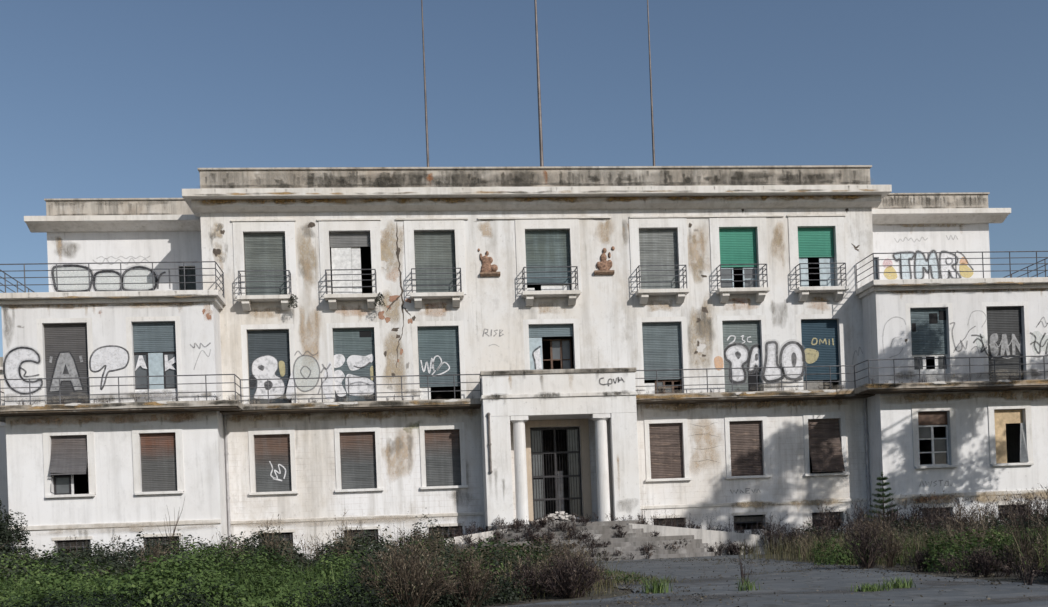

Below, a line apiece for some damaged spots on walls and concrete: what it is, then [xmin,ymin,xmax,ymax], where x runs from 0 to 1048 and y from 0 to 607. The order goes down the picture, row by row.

leakage [202,171,500,205]
leakage [512,172,545,201]
leakage [558,173,651,202]
leakage [664,175,715,200]
crack [386,230,411,368]
peeling [378,294,416,381]